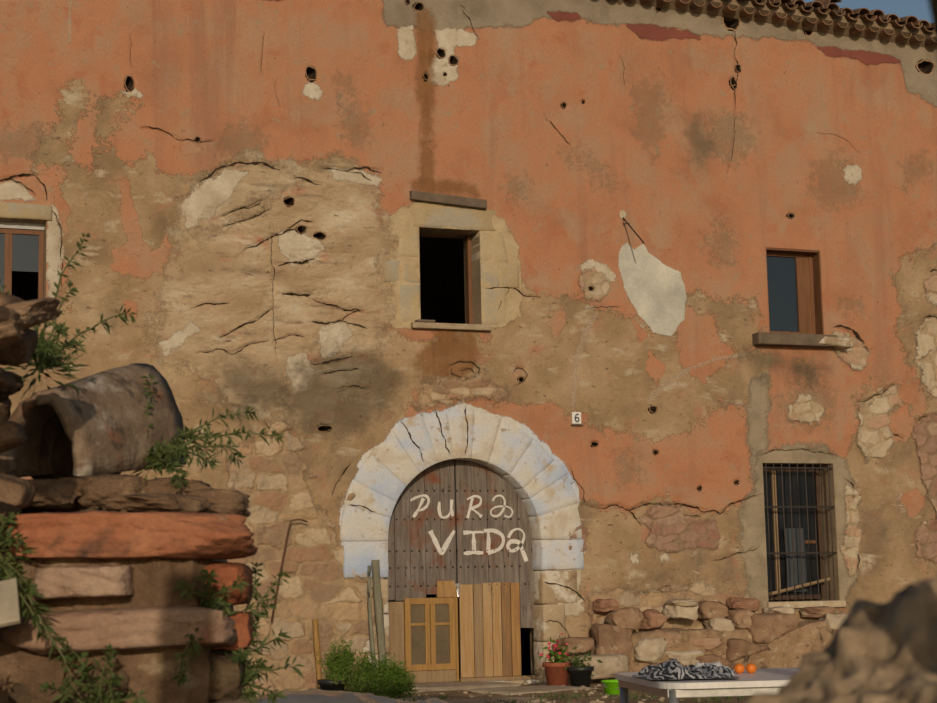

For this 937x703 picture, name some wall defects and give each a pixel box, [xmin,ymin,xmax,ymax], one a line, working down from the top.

crack [145,126,207,143]
spalling [436,48,459,76]
crack [728,34,738,169]
crack [0,173,63,285]
flaking render [1,75,774,544]
crack [434,406,469,453]
flaking render [832,241,937,614]
flaking render [565,492,754,638]